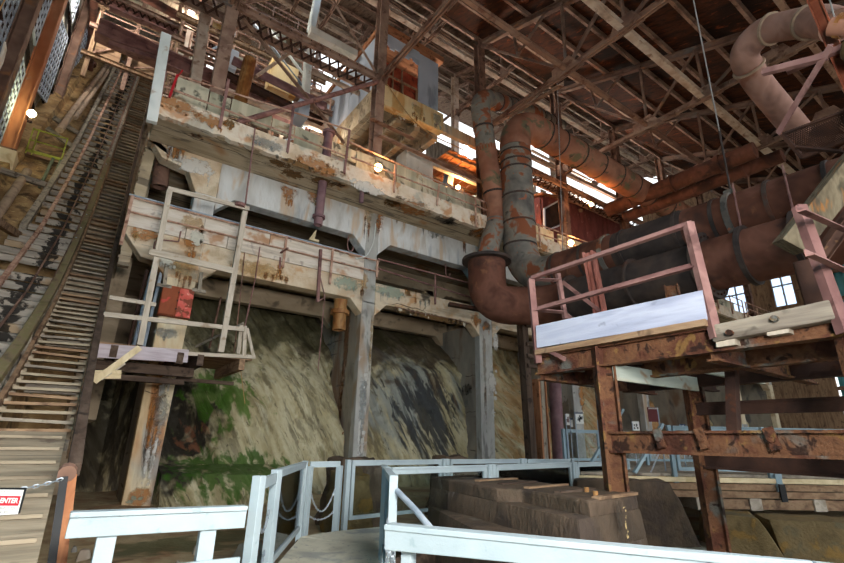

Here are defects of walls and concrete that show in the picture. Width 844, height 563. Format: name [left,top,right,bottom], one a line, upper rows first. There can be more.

corrosion [160,96,223,132]
corrosion [281,186,297,206]
corrosion [131,227,158,241]
corrosion [463,215,485,253]
corrosion [184,239,196,258]